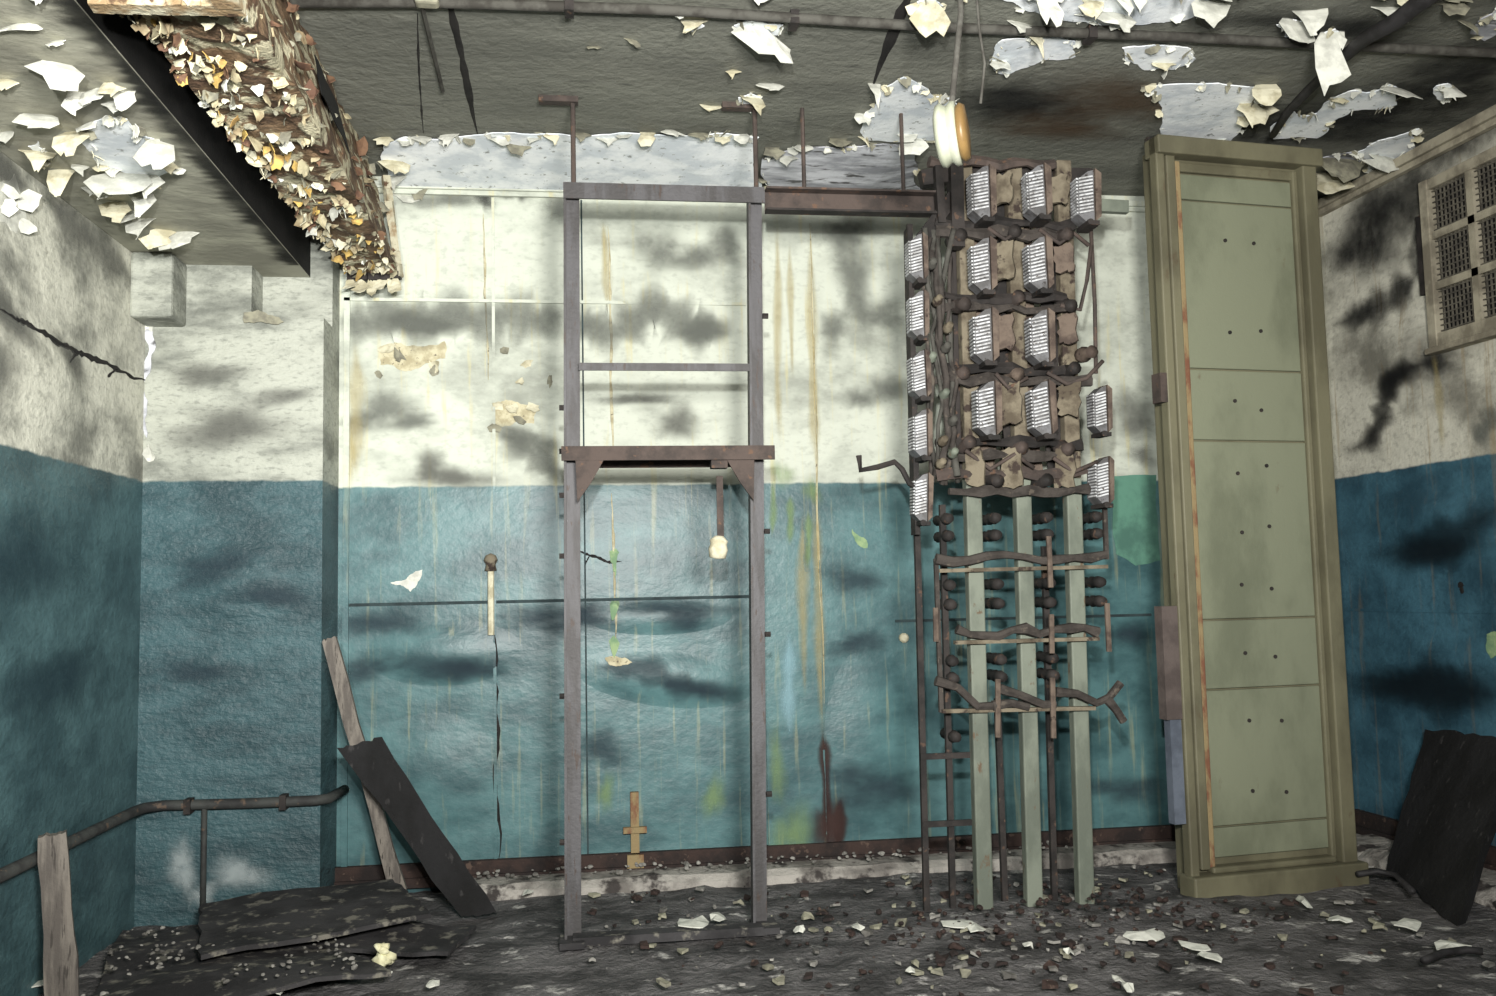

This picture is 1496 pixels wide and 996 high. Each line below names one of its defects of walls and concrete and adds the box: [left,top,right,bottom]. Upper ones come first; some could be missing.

peeling [1434,0,1496,41]
peeling [989,0,1466,144]
peeling [0,23,199,251]
peeling [119,0,967,296]
peeling [1316,128,1424,199]
damp [1336,230,1392,267]
crack [0,309,145,381]
peeling [374,341,447,379]
damp [1382,369,1403,390]
damp [1423,353,1447,373]
crack [493,635,502,857]
rust [816,738,846,843]